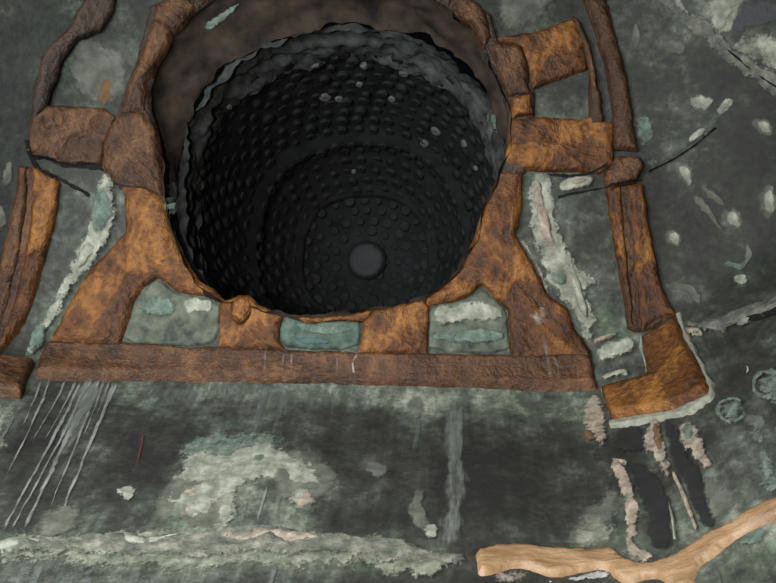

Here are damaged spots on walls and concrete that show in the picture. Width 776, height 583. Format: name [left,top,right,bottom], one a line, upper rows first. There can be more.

crack [718,43,776,87]
crack [24,139,102,197]
crack [548,127,716,199]
water stain [25,383,116,474]
water stain [6,468,79,535]
water stain [445,409,464,540]